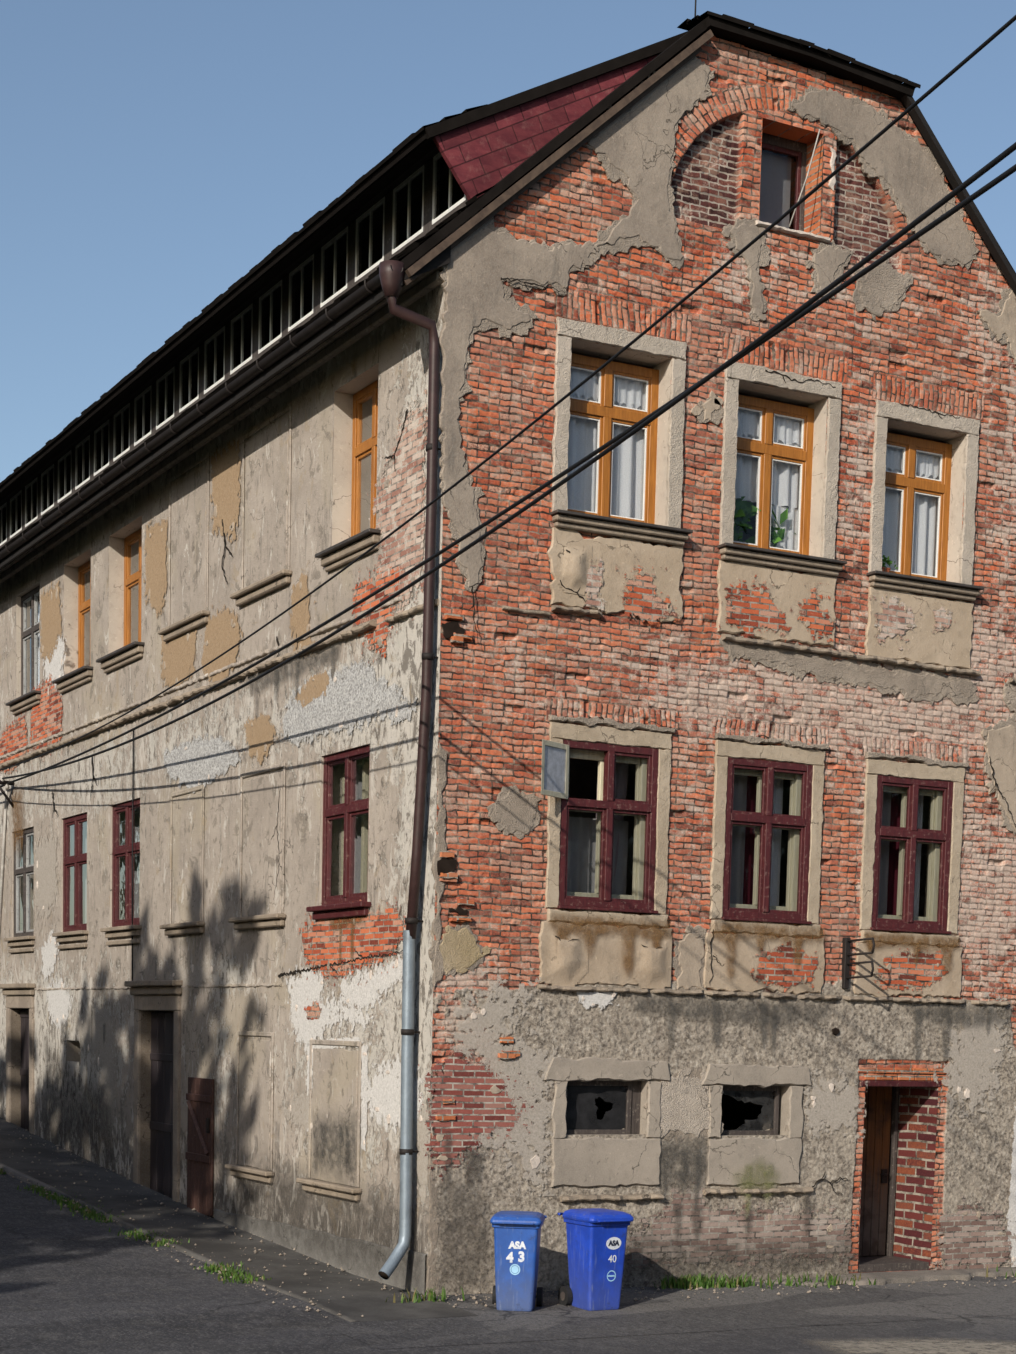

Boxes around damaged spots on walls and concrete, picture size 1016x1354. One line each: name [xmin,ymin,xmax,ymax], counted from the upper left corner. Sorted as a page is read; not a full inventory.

peeling [787,85,979,270]
peeling [721,218,771,322]
peeling [804,240,913,322]
peeling [159,56,715,798]
flaking render [0,581,63,774]
peeling [718,575,979,706]
peeling [486,785,541,840]
flaking render [298,897,406,1020]
flaking render [750,939,821,994]
leakage [314,1124,355,1171]
flaking render [418,1037,534,1182]
leakage [659,1144,708,1218]